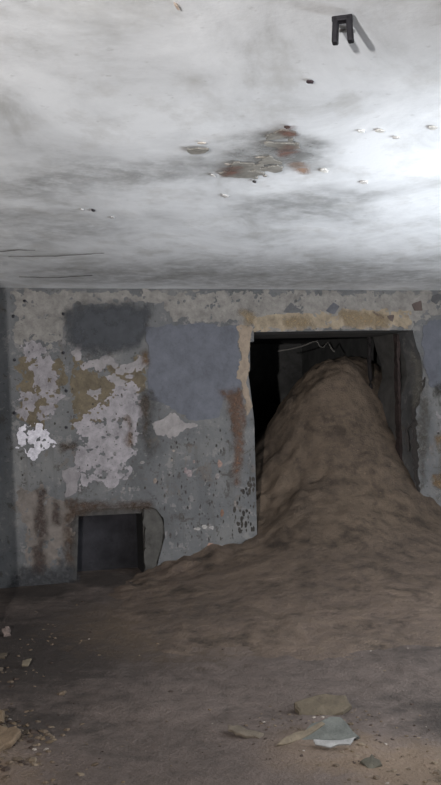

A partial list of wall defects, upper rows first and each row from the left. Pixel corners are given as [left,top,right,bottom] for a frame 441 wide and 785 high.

spalling [187,142,209,154]
spalling [210,125,300,183]
corrosion [278,127,298,157]
flaking render [10,288,441,572]
corrosion [222,388,246,484]
crack [405,377,426,492]